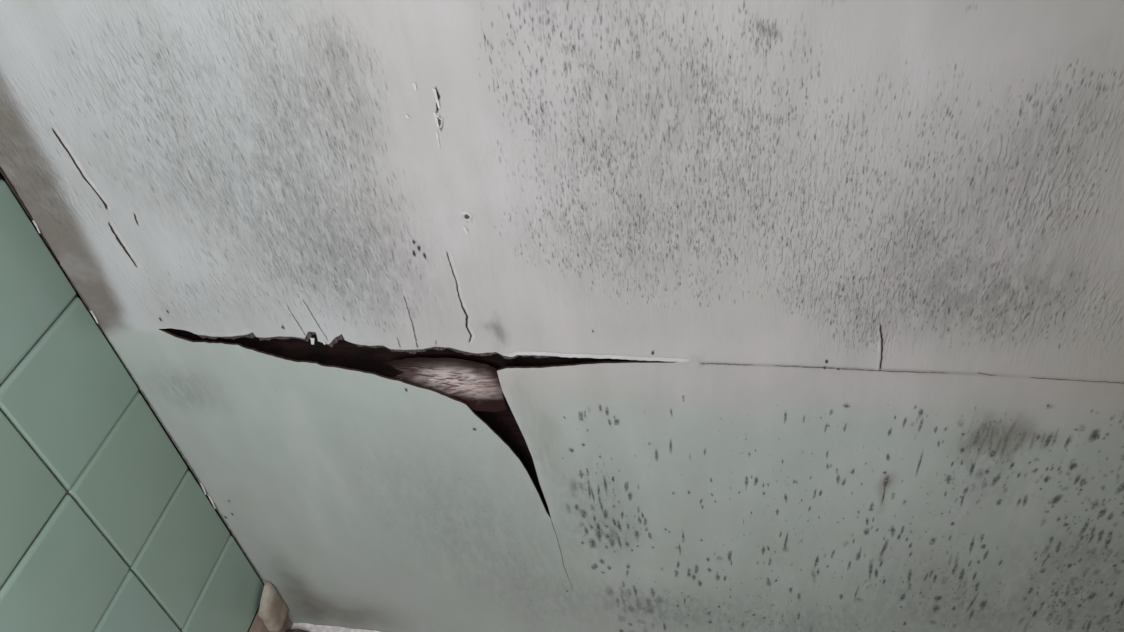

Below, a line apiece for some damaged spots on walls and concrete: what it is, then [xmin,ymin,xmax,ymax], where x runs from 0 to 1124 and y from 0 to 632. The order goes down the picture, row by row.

leakage [0,103,87,258]
crack [52,127,143,268]
crack [0,167,263,581]
crack [164,251,738,586]
crack [783,323,936,373]
leakage [576,477,654,552]